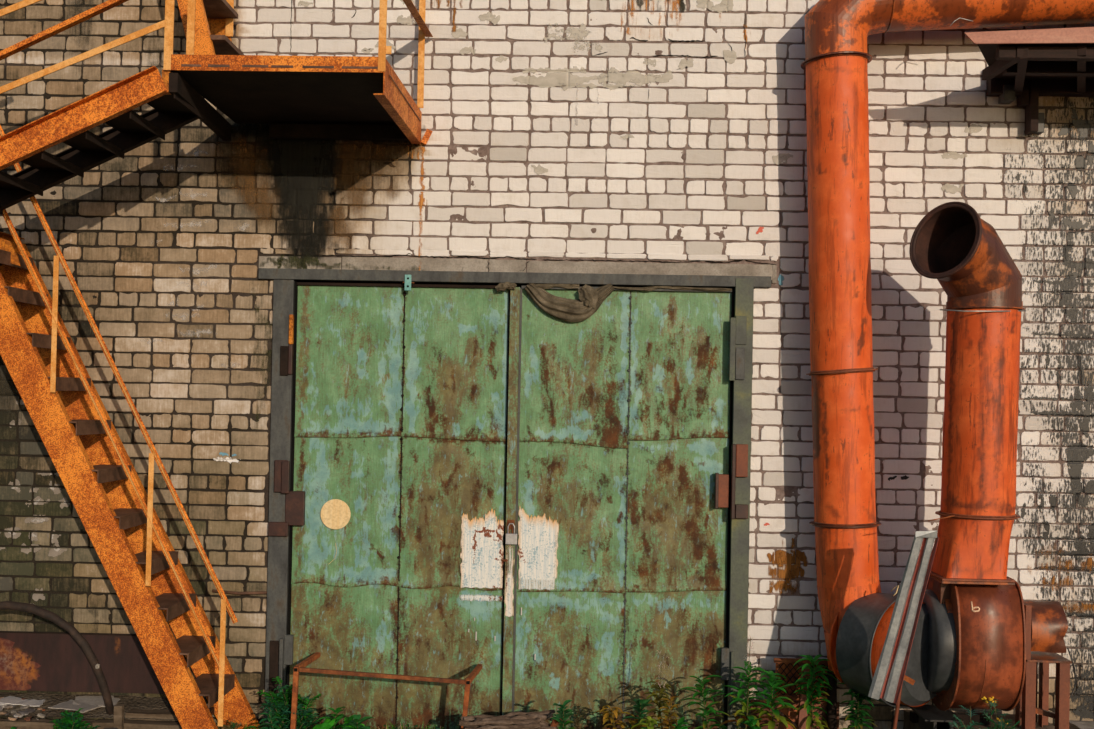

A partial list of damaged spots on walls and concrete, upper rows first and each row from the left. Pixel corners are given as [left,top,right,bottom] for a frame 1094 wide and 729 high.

peeling [522,66,624,90]
damp [1068,118,1094,205]
damp [222,115,419,269]
damp [1062,227,1074,261]
damp [1045,343,1062,388]
damp [1070,355,1094,438]
damp [1039,494,1058,540]
damp [1073,524,1094,562]
corrosion [767,538,808,596]